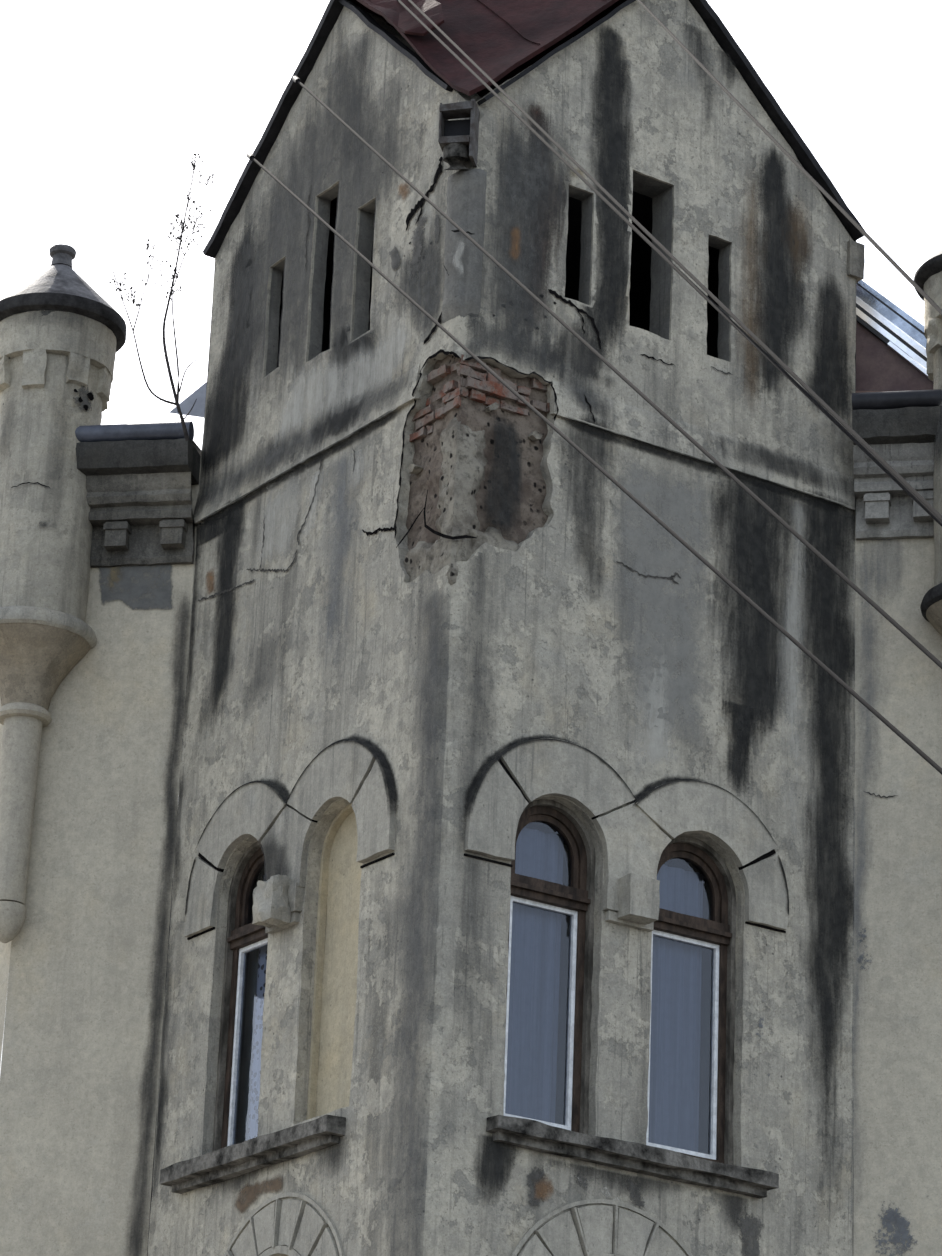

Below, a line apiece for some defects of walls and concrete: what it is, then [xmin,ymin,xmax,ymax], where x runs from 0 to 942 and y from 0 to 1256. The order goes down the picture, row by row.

damp [202,230,252,473]
crack [198,459,322,601]
crack [406,156,443,230]
spalling [394,349,559,585]
damp [555,28,631,379]
crack [616,561,681,584]
damp [752,148,853,418]
damp [129,501,397,1256]
damp [464,475,871,1131]